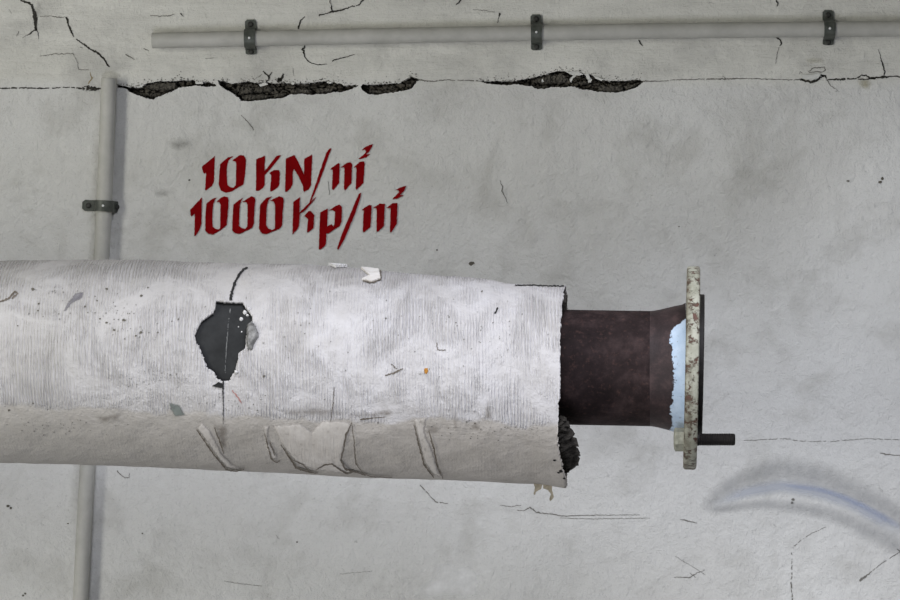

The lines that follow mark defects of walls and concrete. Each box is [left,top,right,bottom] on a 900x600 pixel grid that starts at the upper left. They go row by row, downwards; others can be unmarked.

crack [0,0,149,91]
crack [259,0,364,83]
flaking render [118,71,421,101]
flaking render [479,67,643,93]
crack [826,50,900,91]
crack [744,438,900,456]
crack [500,505,643,519]